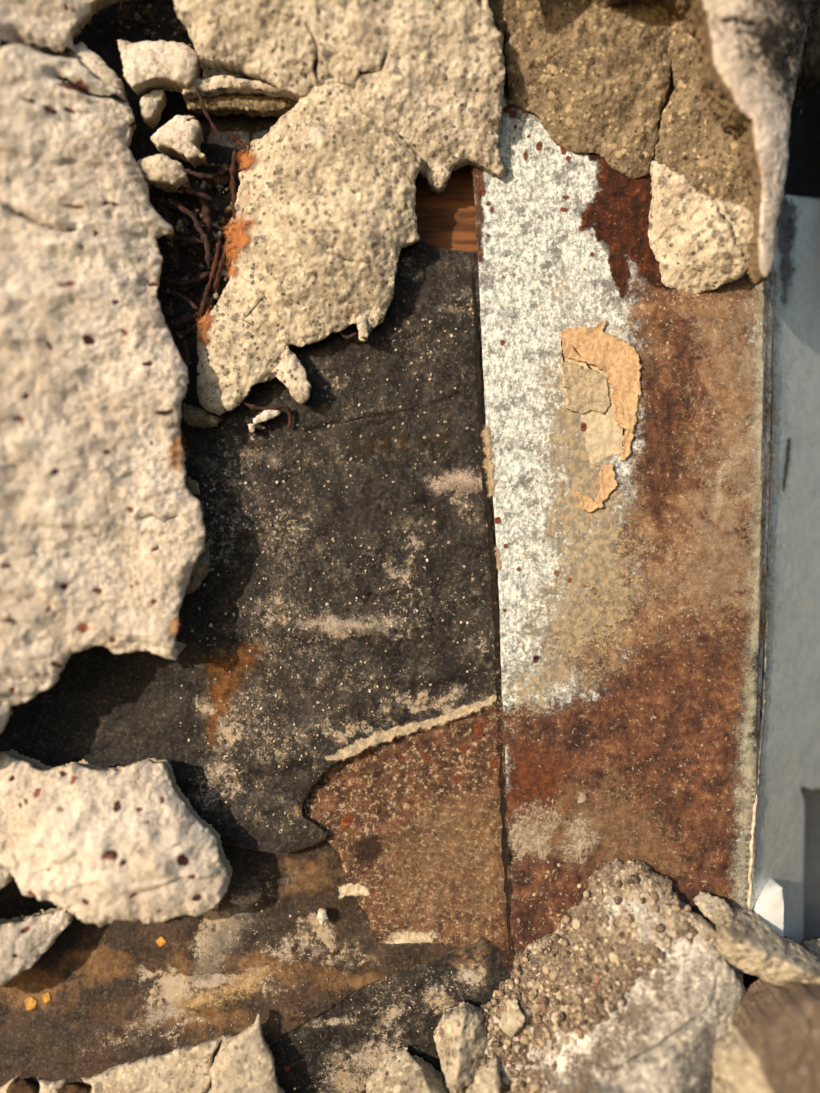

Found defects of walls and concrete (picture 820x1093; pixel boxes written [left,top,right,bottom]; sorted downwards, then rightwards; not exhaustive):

crack [298,15,320,84]
crack [350,52,388,86]
crack [501,31,509,98]
spalling [660,79,673,119]
leakage [706,0,820,136]
corrosion [225,213,256,277]
corrosion [197,311,212,344]
peeling [560,321,642,513]
corrosion [302,153,787,978]
corrosion [207,644,263,748]
peeling [210,1011,279,1093]
crack [581,974,718,1071]